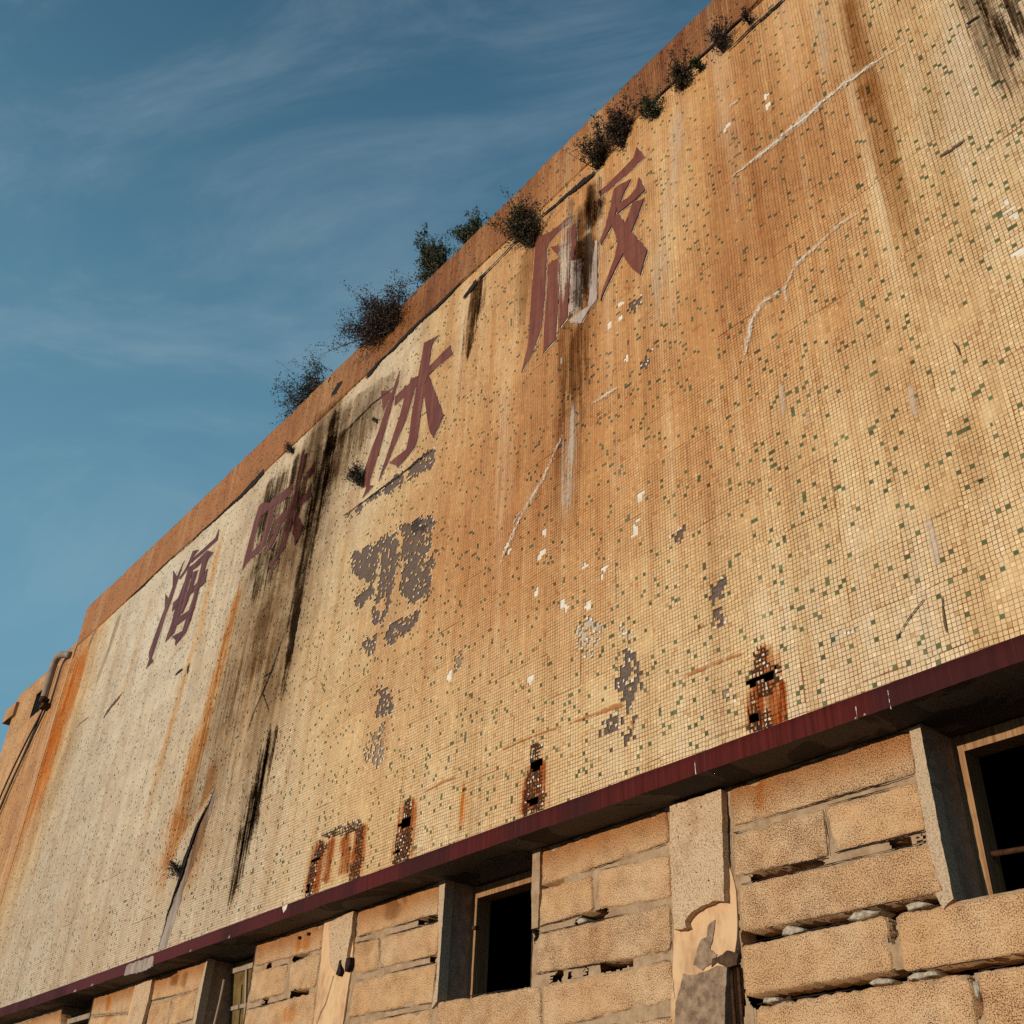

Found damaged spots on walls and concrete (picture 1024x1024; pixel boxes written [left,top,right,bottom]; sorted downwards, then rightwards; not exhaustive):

water stain [976,0,1024,59]
crack [736,42,905,173]
water stain [462,276,486,358]
water stain [558,177,604,311]
crack [742,214,856,367]
peeling [345,447,436,518]
water stain [250,409,340,694]
peeling [350,514,440,657]
peeling [364,685,394,769]
peeling [599,622,645,753]
water stain [226,725,281,915]
spalling [674,920,742,1024]